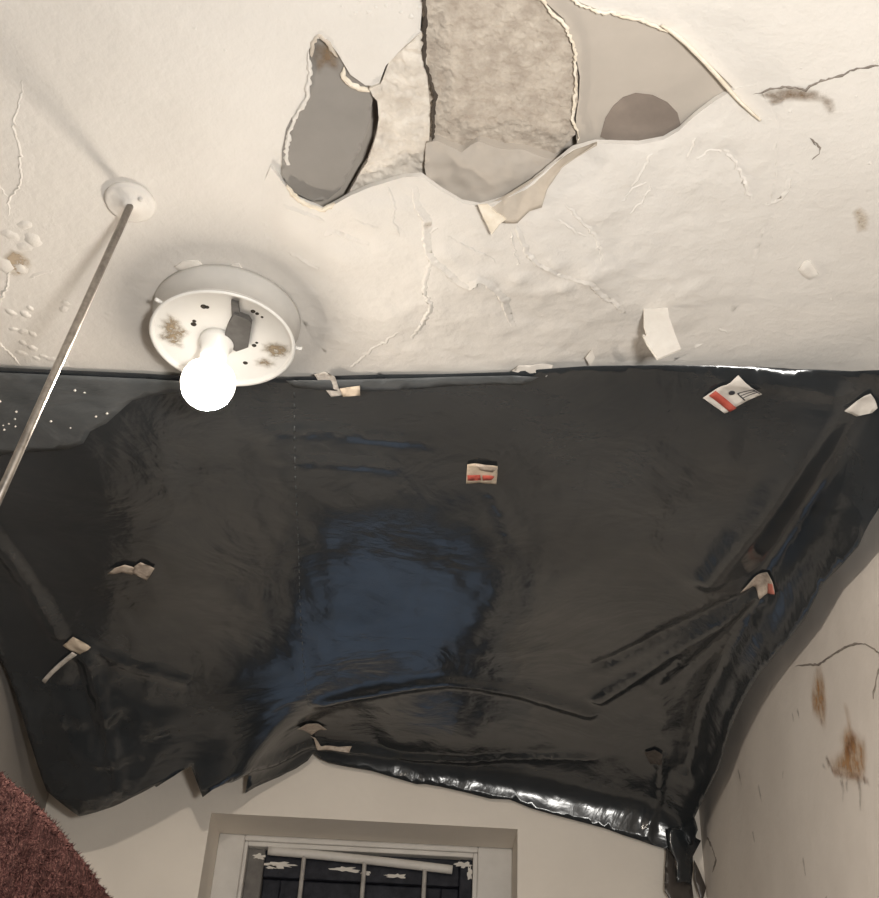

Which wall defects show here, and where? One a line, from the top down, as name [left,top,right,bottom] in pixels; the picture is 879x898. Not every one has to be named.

crack [755,65,879,94]
spalling [282,0,761,234]
crack [0,80,24,215]
crack [351,186,626,368]
crack [0,342,21,366]
crack [797,643,879,666]
corrosion [828,734,863,775]